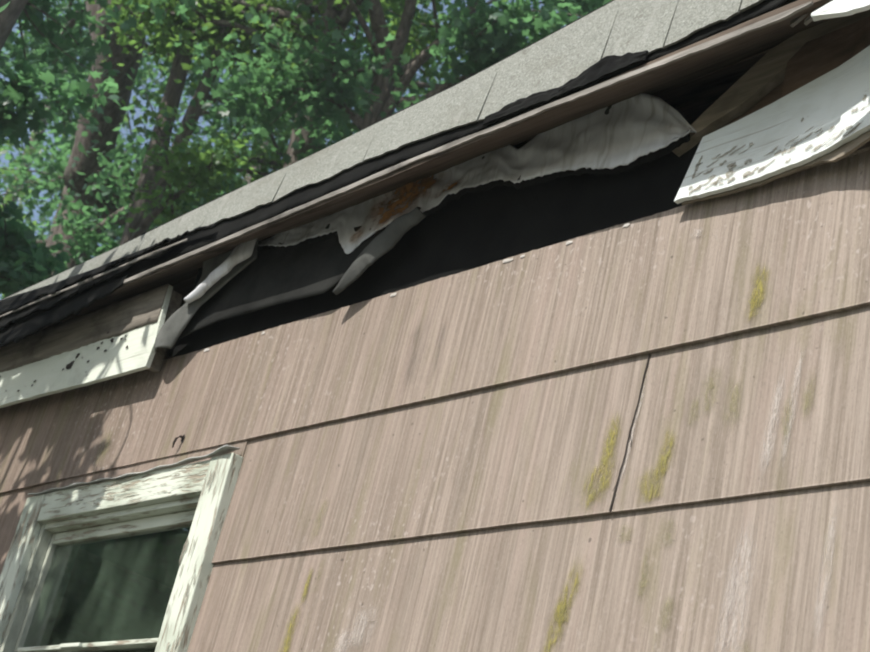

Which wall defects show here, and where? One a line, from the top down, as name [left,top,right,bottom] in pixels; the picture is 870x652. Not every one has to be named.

rust [371,175,458,225]
leakage [586,422,618,505]
crack [609,354,650,511]